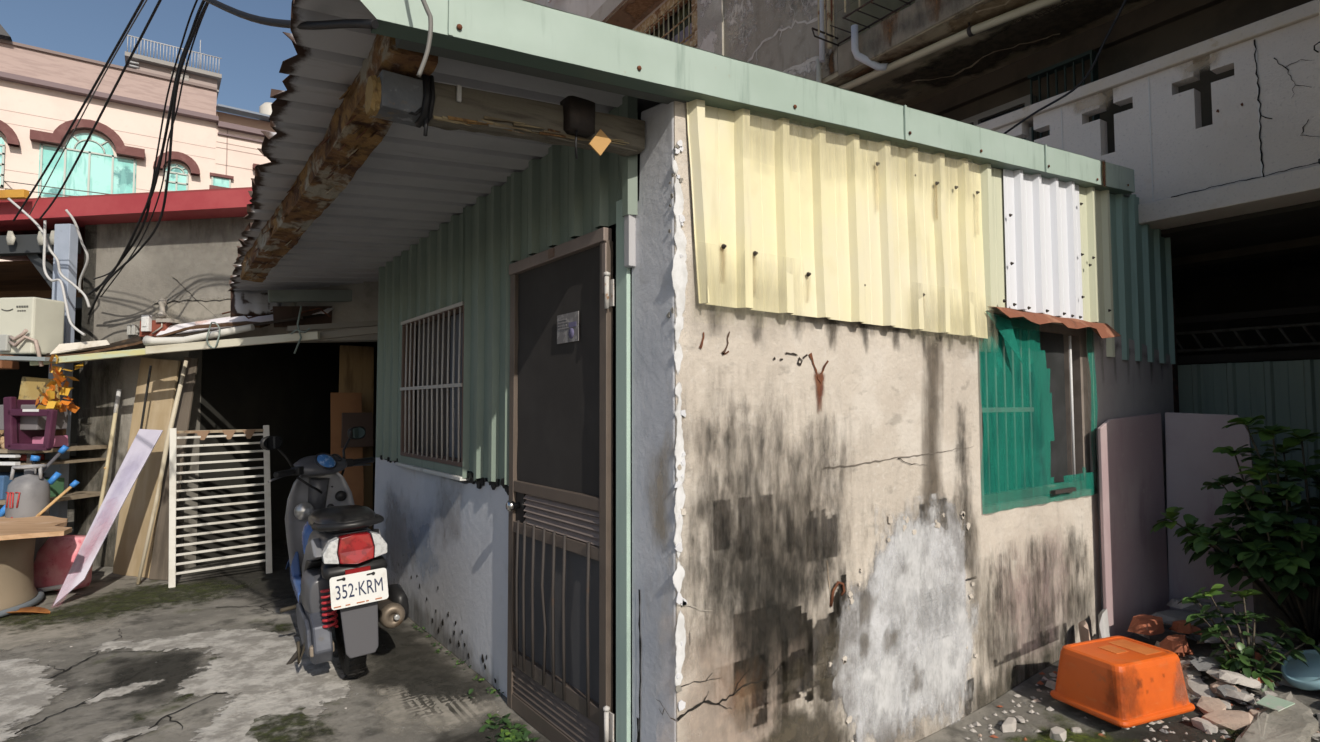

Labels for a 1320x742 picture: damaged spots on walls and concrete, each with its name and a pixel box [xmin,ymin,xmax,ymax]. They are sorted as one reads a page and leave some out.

crack [747,5,832,76]
crack [1171,39,1318,198]
crack [637,589,780,742]
damp [710,481,826,661]
damp [763,631,848,742]
rust [809,353,829,409]
damp [828,320,836,343]
damp [923,333,942,522]
spalling [828,494,1058,742]
damp [959,417,973,572]
rust [988,306,1121,338]
peeling [1121,676,1282,742]